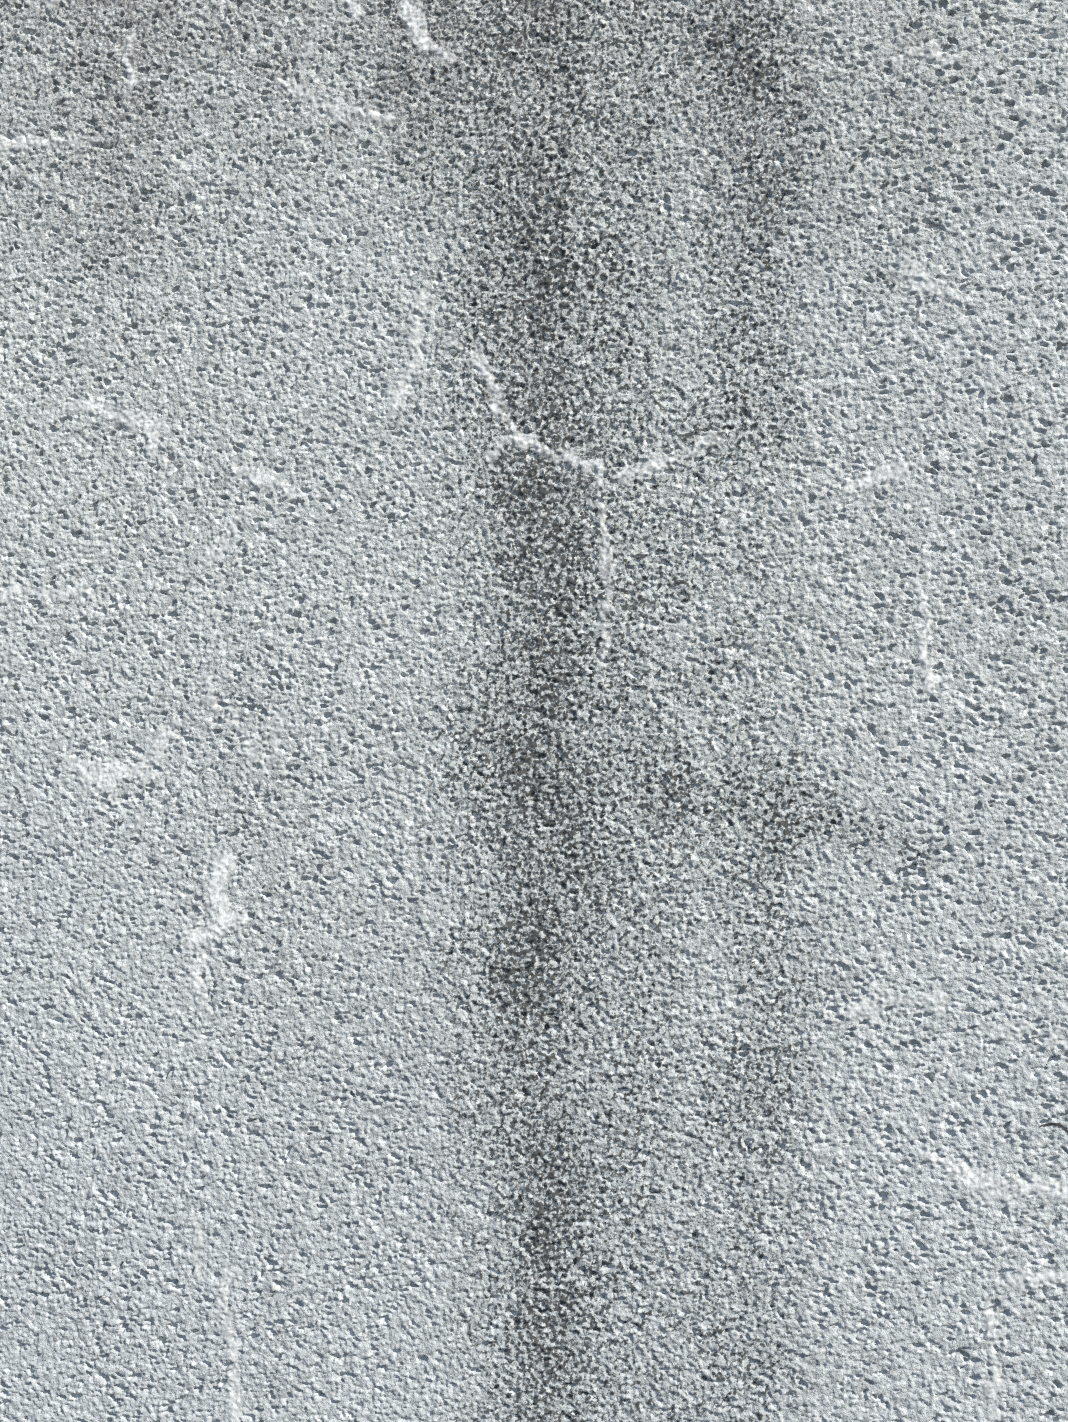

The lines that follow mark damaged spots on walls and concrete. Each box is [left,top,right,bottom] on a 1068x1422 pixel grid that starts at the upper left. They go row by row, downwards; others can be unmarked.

crack [387,283,722,660]
water stain [373,0,932,1422]